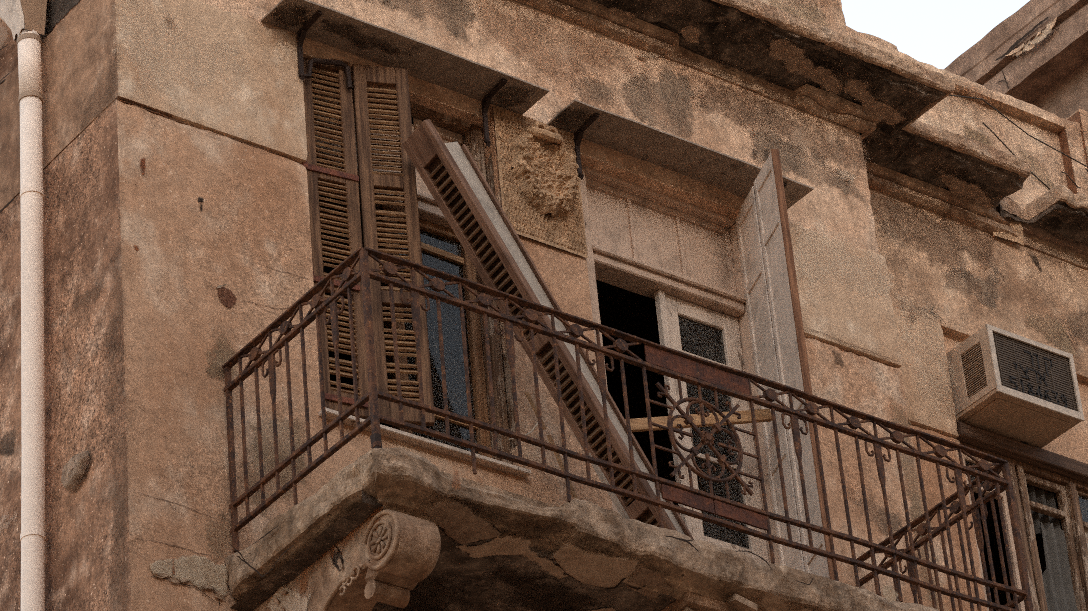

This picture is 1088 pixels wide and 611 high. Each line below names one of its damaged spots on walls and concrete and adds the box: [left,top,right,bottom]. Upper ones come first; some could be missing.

damp [437,0,475,41]
damp [599,69,695,132]
flaking render [769,39,905,124]
damp [952,268,998,308]
flaking render [427,502,639,589]
flaking render [150,555,228,603]